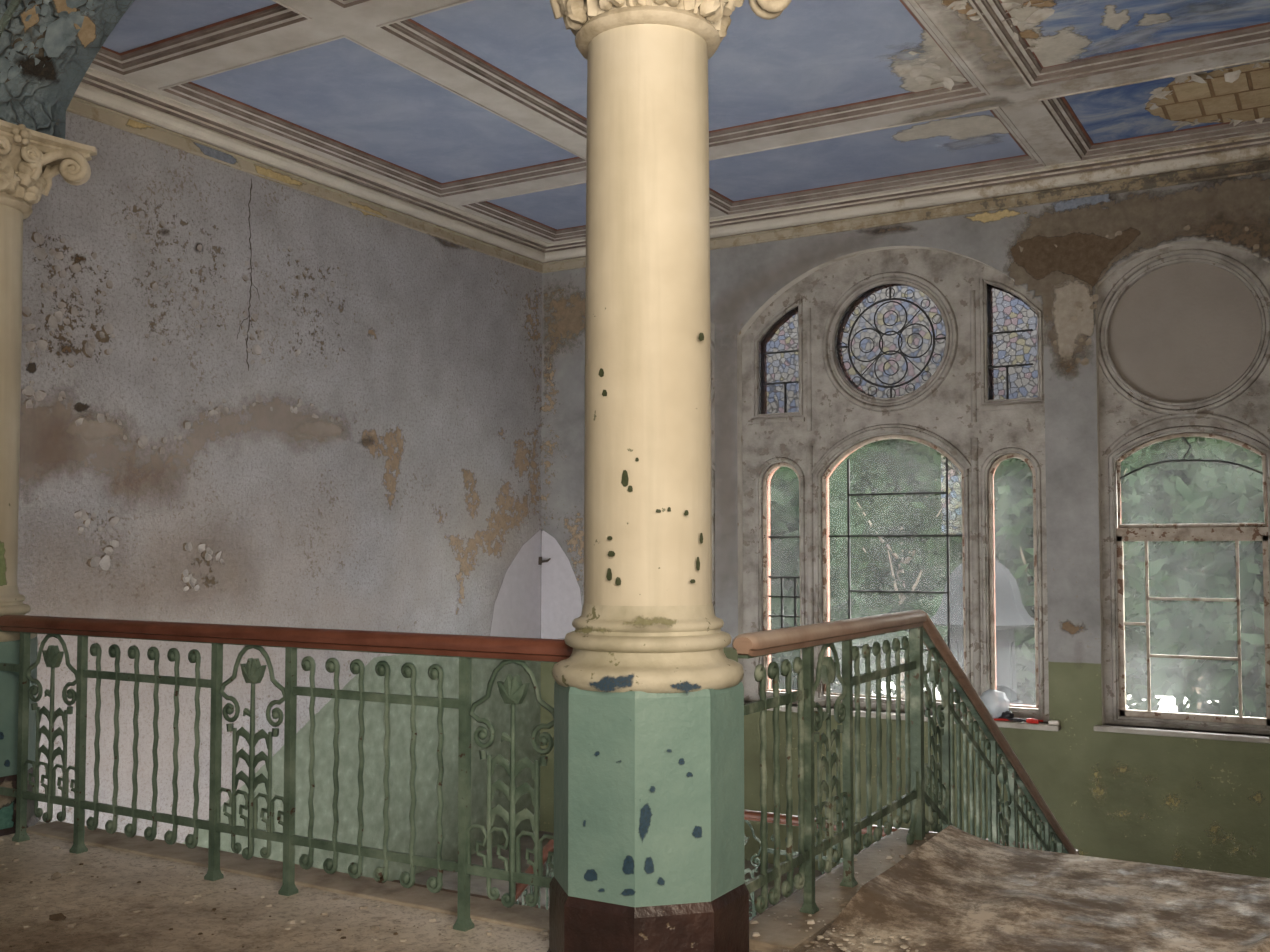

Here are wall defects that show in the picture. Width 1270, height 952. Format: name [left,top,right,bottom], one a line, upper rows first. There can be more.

peeling [891,30,967,92]
peeling [942,0,1171,86]
flaking render [1145,59,1270,131]
peeling [893,101,1009,148]
flaking render [966,162,1270,375]
peeling [22,232,115,373]
peeling [624,616,676,627]
peeling [590,674,634,692]
peeling [671,681,701,694]
peeling [639,786,655,841]
peeling [584,869,604,892]
peeling [623,856,665,885]